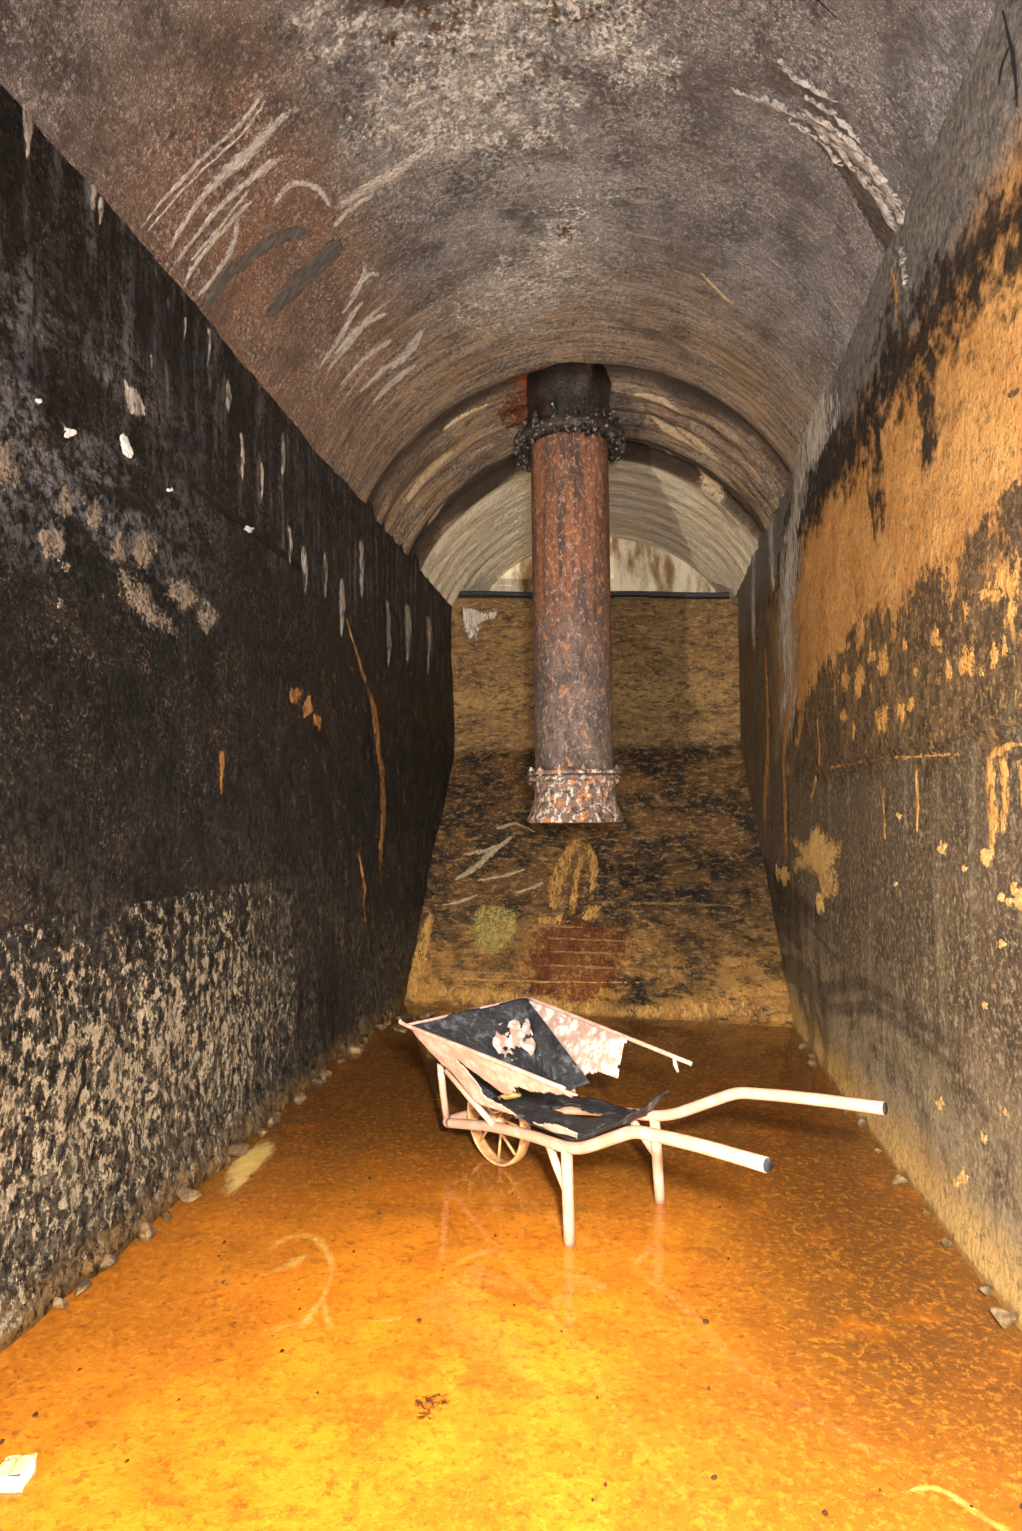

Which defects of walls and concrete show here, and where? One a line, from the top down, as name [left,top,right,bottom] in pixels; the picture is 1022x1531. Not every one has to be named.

crack [998,10,1018,107]
damp [23,103,33,157]
damp [142,0,683,366]
flaking render [729,51,909,290]
damp [318,265,424,405]
corrosion [496,363,557,428]
damp [240,433,285,499]
damp [288,527,365,637]
damp [750,373,849,739]
damp [386,600,432,675]
corrosion [290,687,322,730]
corrosion [347,618,386,922]